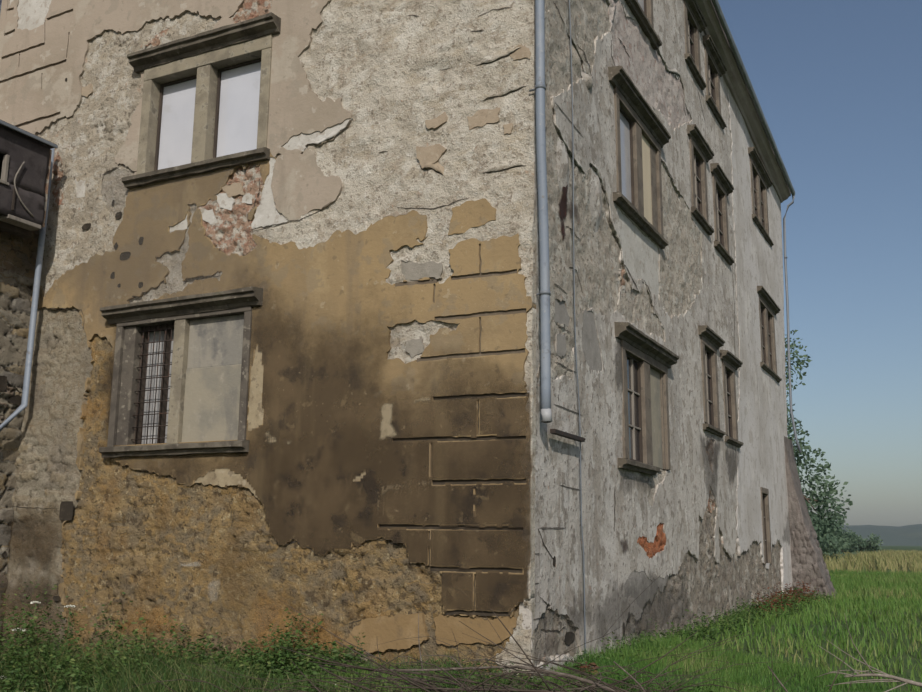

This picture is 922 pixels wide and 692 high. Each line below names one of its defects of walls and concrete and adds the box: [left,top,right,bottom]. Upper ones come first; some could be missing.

crack [658,49,705,121]
crack [552,114,654,308]
flaking render [0,0,703,682]
leakage [145,301,532,617]
flaking render [621,490,782,651]